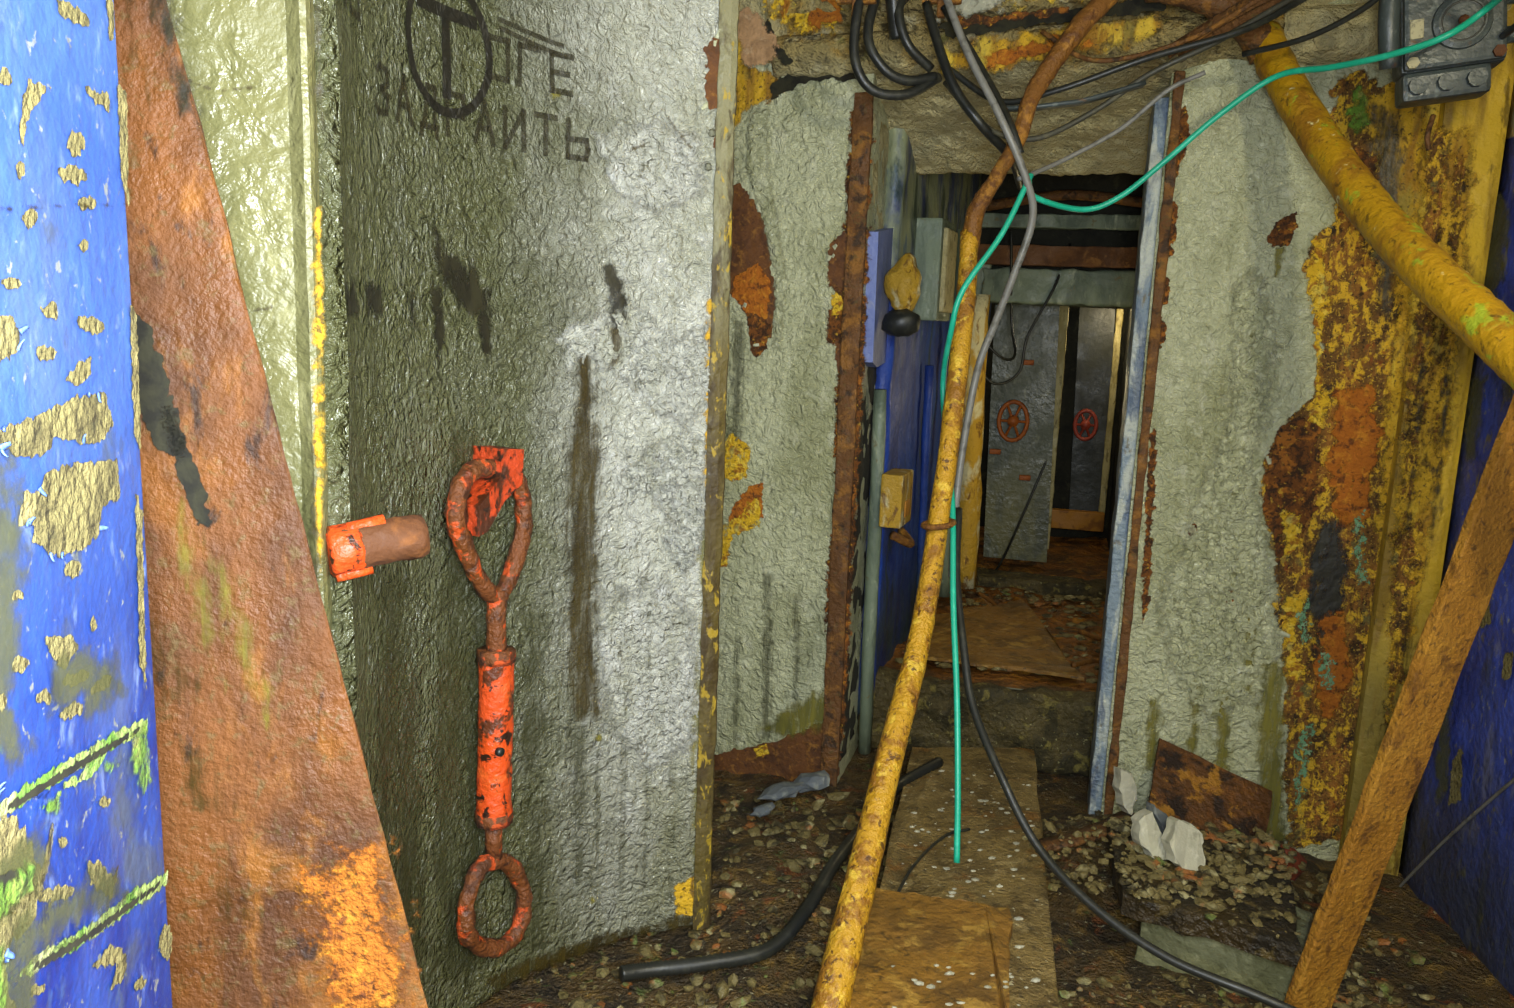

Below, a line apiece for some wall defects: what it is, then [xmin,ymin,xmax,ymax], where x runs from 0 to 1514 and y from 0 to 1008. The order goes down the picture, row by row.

peeling [0,67,51,180]
peeling [58,129,96,211]
corrosion [1328,68,1478,270]
corrosion [311,208,325,567]
leakage [0,456,25,761]
peeling [0,356,147,689]
leakage [53,653,124,716]
leakage [566,355,599,719]
corrosion [1252,203,1458,849]
peeling [0,814,119,1008]
leakage [2,872,129,1008]
corrosion [295,843,419,1008]